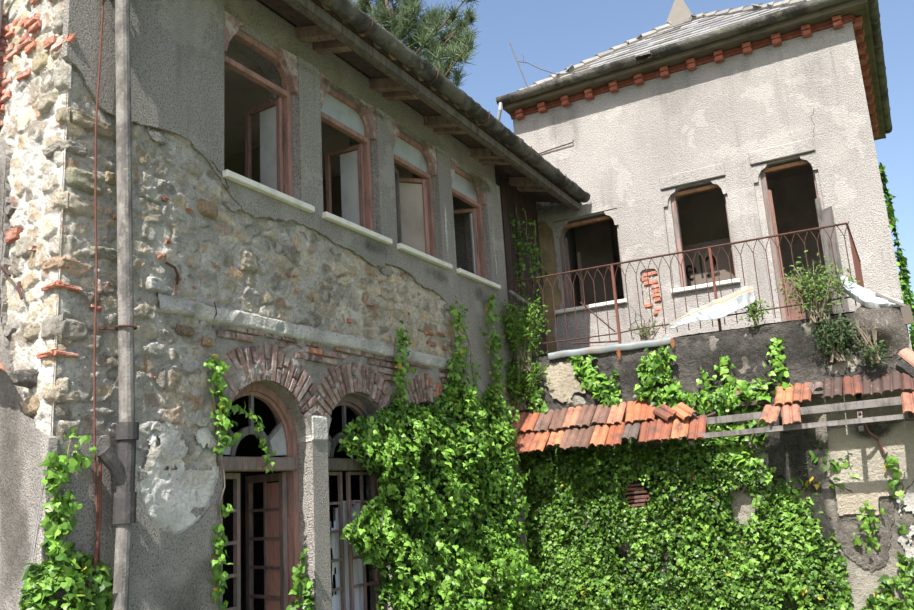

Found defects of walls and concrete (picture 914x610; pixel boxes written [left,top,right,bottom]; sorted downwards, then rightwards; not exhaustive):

flaking render [0,0,119,442]
flaking render [131,122,468,535]
flaking render [538,221,562,353]
flaking render [544,361,585,404]
flaking render [641,269,662,320]
damp [0,400,27,595]
flaking render [827,420,914,572]